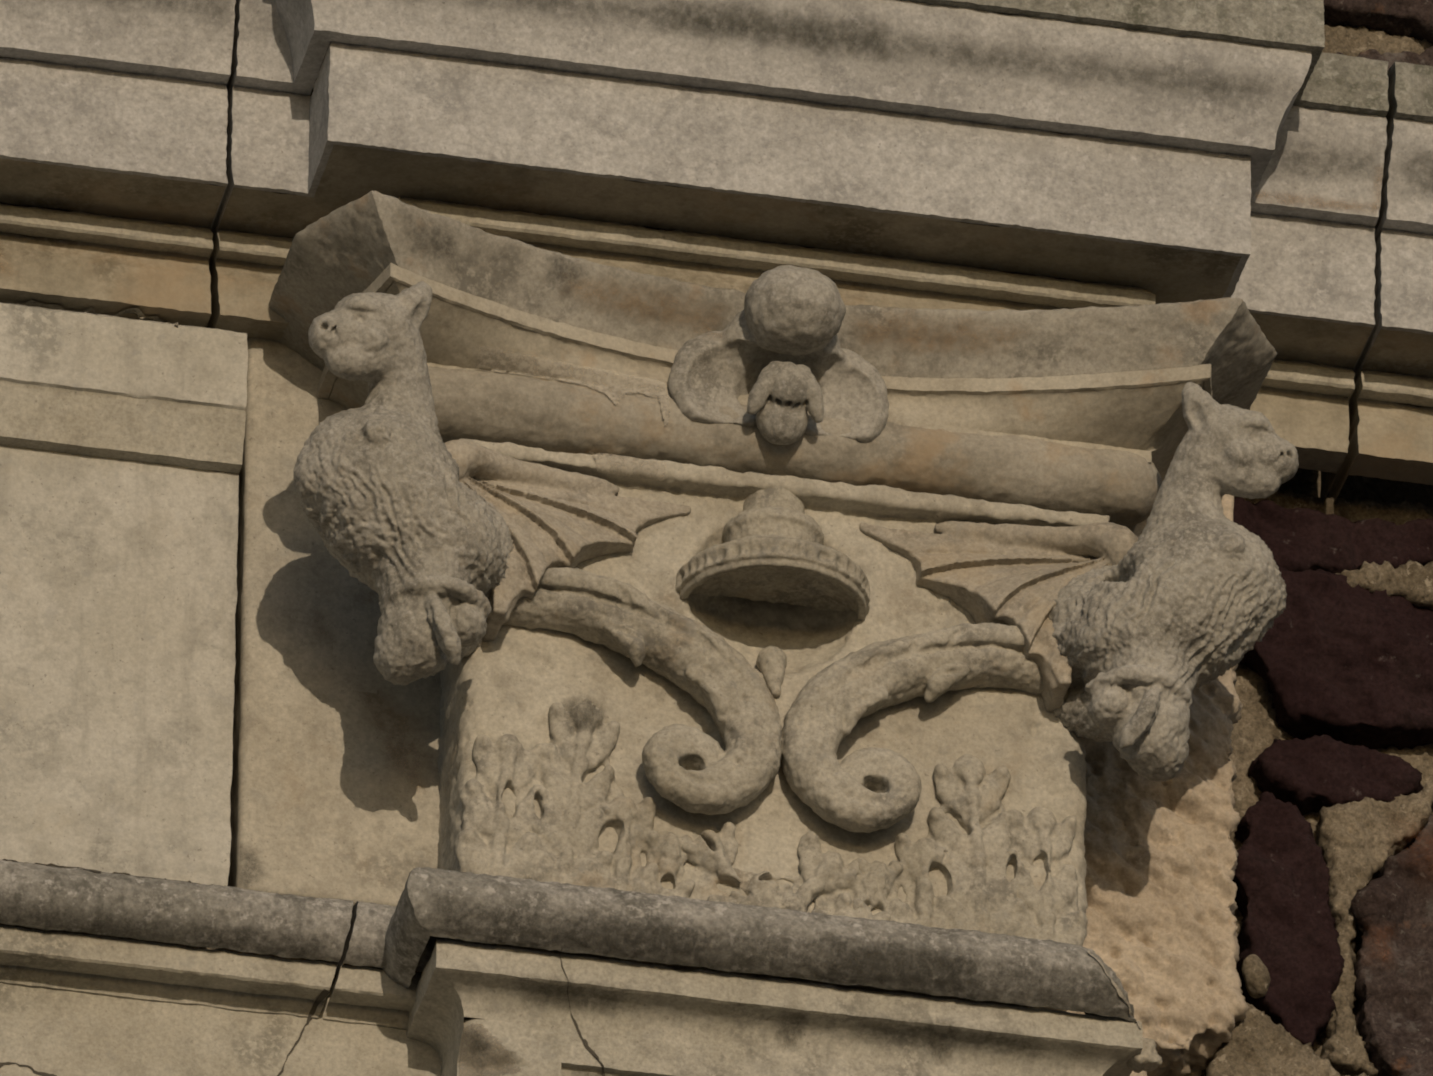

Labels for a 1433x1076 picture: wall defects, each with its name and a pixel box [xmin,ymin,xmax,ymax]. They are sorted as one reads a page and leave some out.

crack [0,1062,57,1076]
crack [277,989,330,1076]
crack [560,946,605,1076]